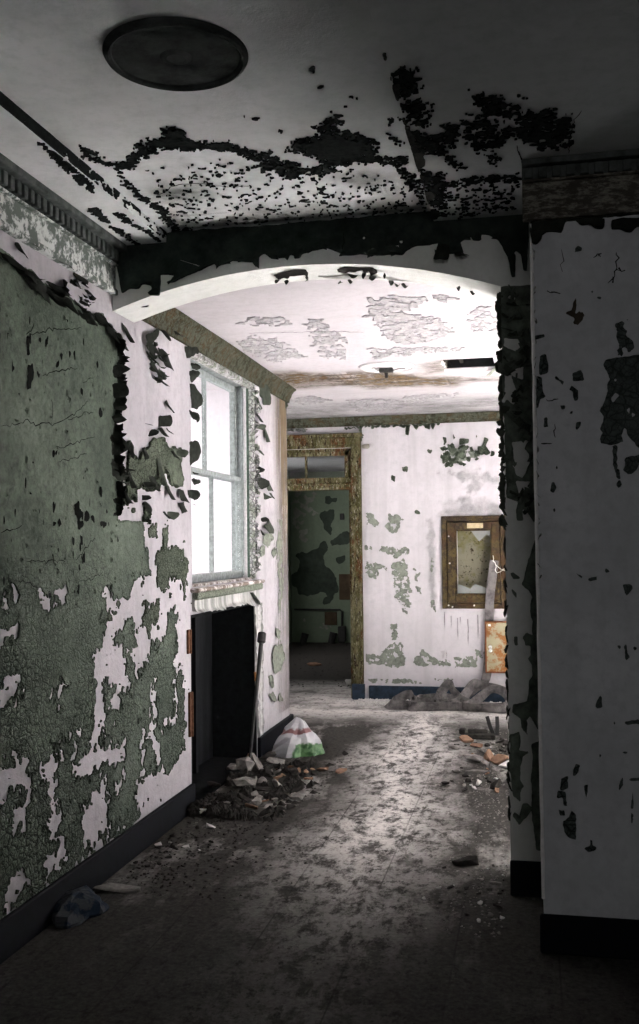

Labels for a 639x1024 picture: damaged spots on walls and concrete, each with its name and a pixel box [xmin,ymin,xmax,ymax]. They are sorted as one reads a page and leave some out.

crack [3,367,94,462]
peeling [0,65,639,852]
crack [14,538,102,588]